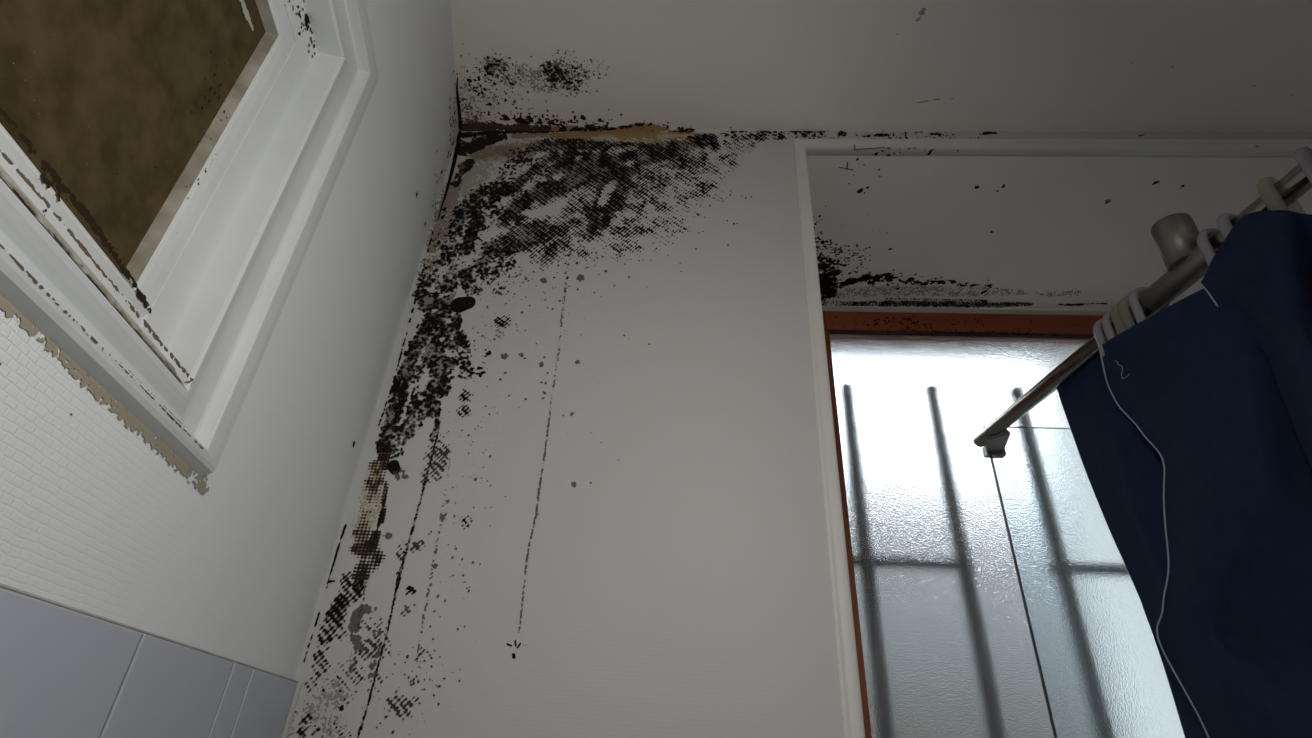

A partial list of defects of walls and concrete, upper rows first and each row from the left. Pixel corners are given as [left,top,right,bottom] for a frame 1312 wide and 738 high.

peeling [656,133,714,148]
leakage [813,206,1081,336]
leakage [287,49,997,738]